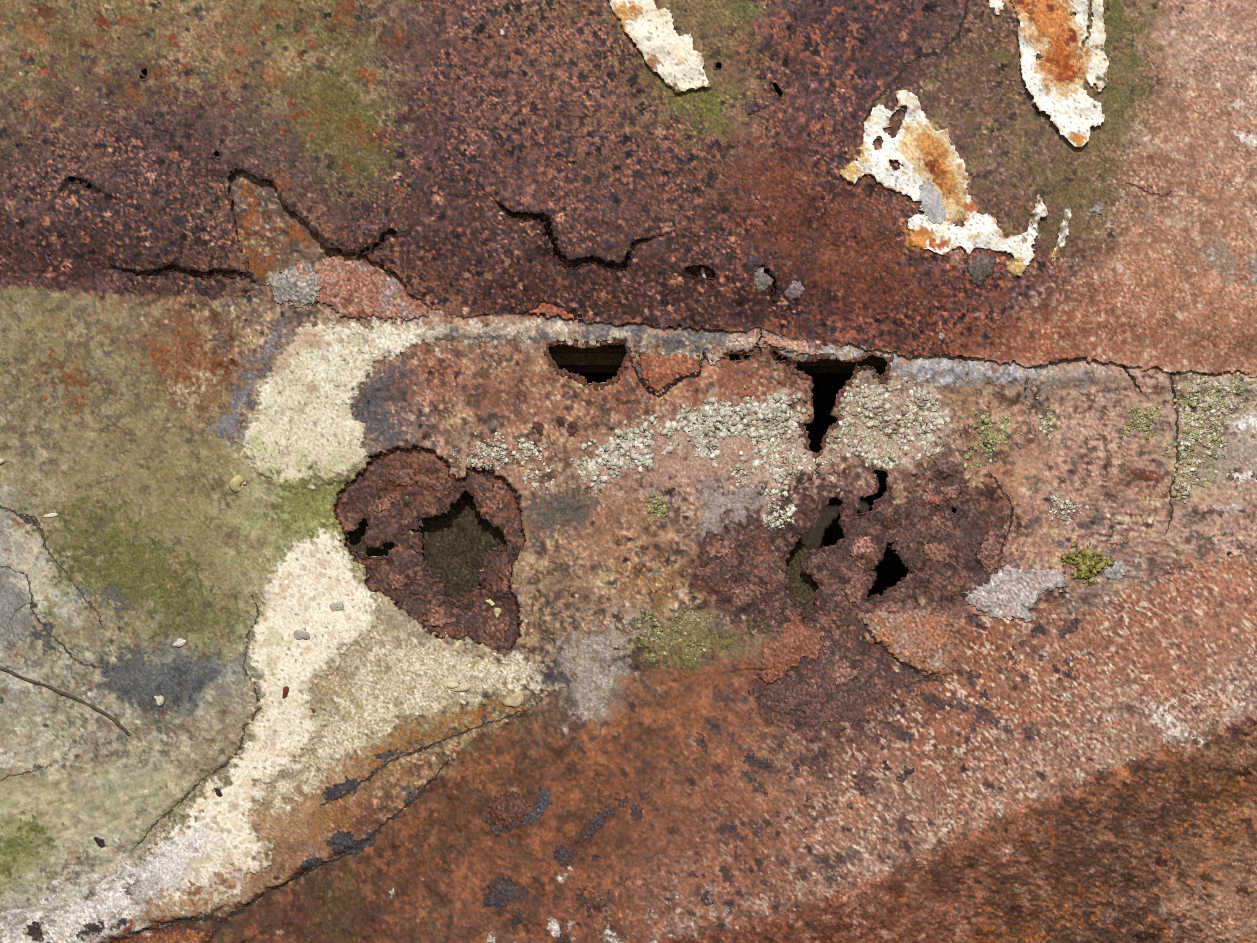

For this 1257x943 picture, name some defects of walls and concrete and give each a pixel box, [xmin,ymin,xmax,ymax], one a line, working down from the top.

peeling [609,0,722,92]
peeling [989,0,1109,147]
corrosion [1003,0,1099,99]
corrosion [895,121,980,223]
peeling [840,89,1048,276]
crack [122,261,256,283]
corrosion [237,179,429,323]
crack [626,350,709,398]
spalling [803,373,853,453]
corrosion [861,604,967,682]
crack [134,595,262,848]
crack [110,710,521,943]